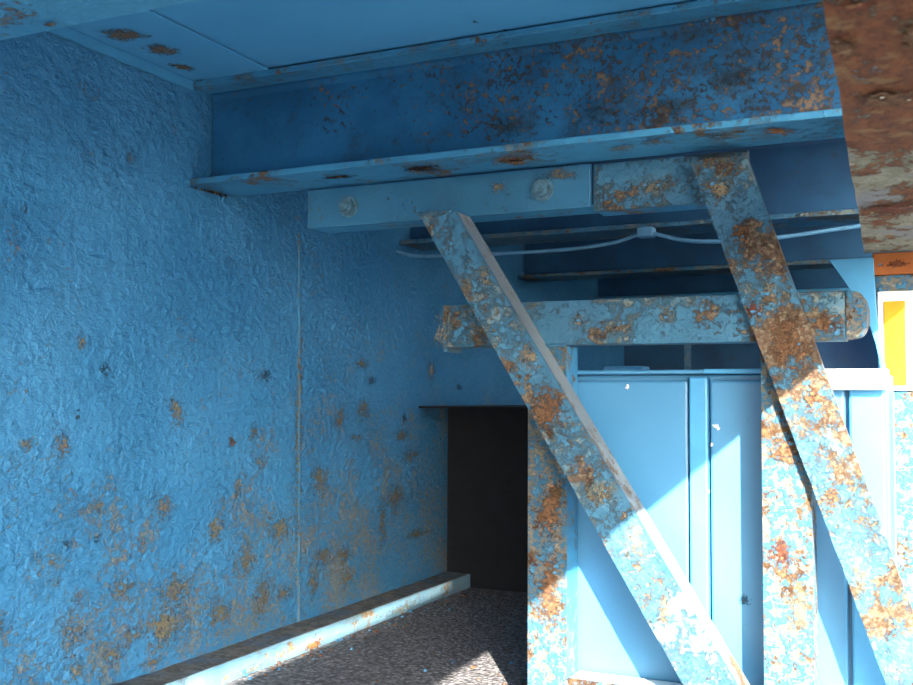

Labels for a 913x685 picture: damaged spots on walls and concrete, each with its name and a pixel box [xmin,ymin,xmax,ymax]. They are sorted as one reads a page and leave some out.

rust [748,274,845,376]
rust [53,592,89,679]
rust [102,573,195,667]
rust [163,398,187,429]
rust [203,516,224,544]
rust [233,296,351,619]
rust [533,478,563,631]
rust [531,383,571,440]
rust [770,433,801,464]
rust [768,535,811,633]
rust [796,381,826,413]
rust [821,473,842,516]